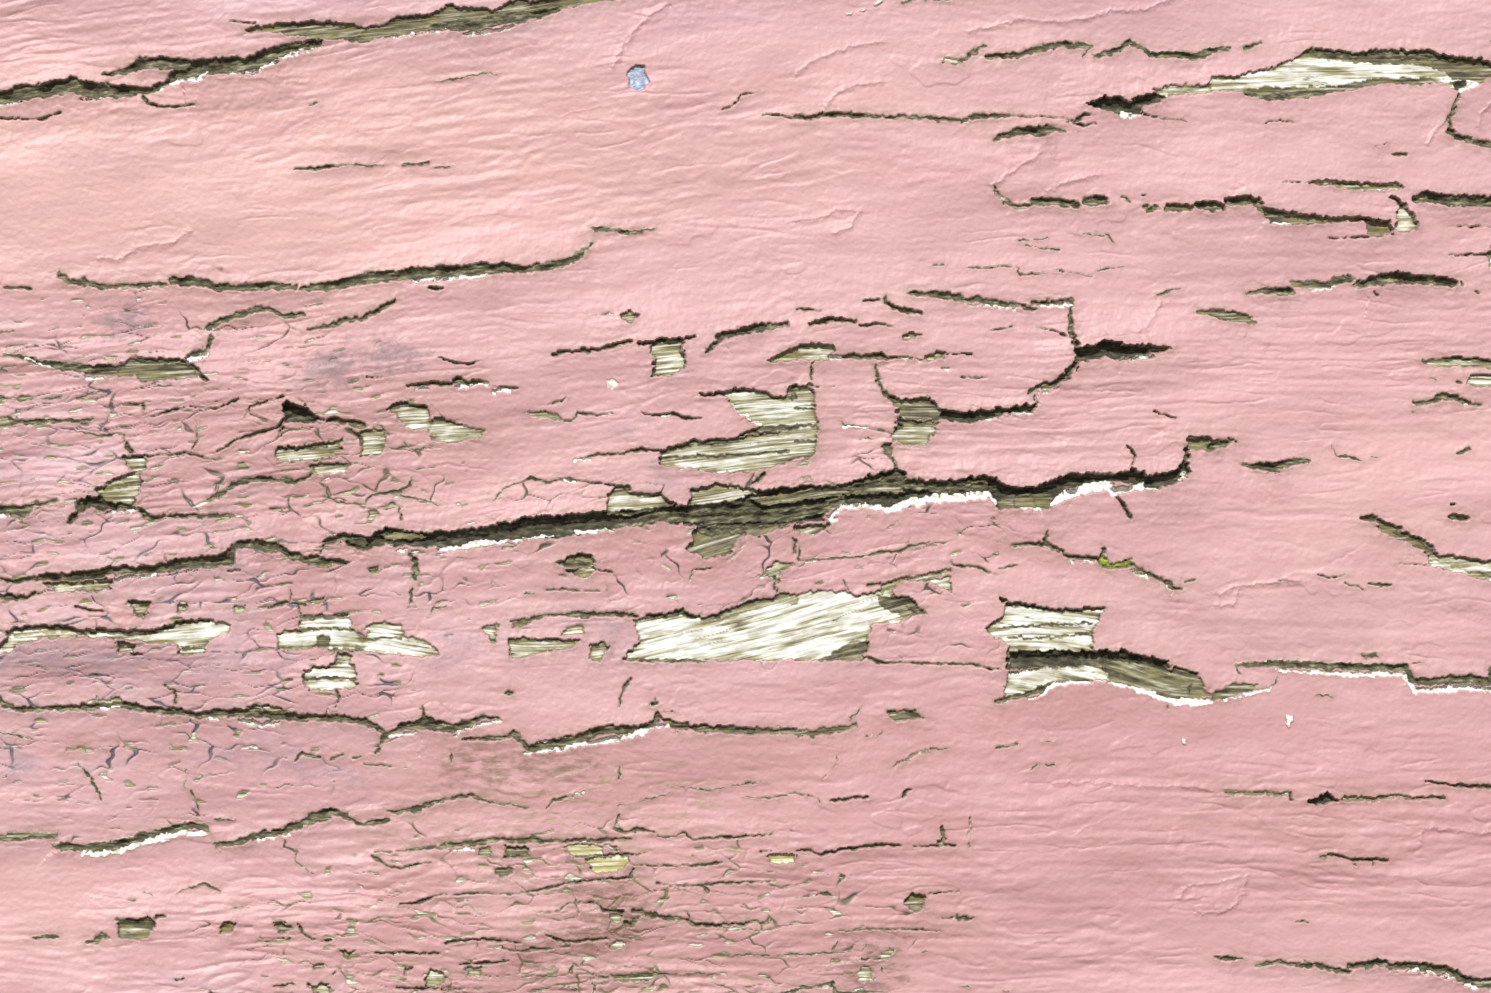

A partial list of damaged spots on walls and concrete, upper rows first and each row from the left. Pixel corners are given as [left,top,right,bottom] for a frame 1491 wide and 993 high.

crack [0,0,620,122]
crack [941,38,1263,67]
peeling [1085,46,1491,123]
crack [0,240,594,453]
peeling [573,331,1041,486]
crack [704,185,1491,404]
peeling [1447,251,1491,270]
crack [0,409,1198,620]
peeling [1359,513,1491,583]
peeling [275,606,441,693]
peeling [480,566,1214,710]
crack [0,677,976,993]